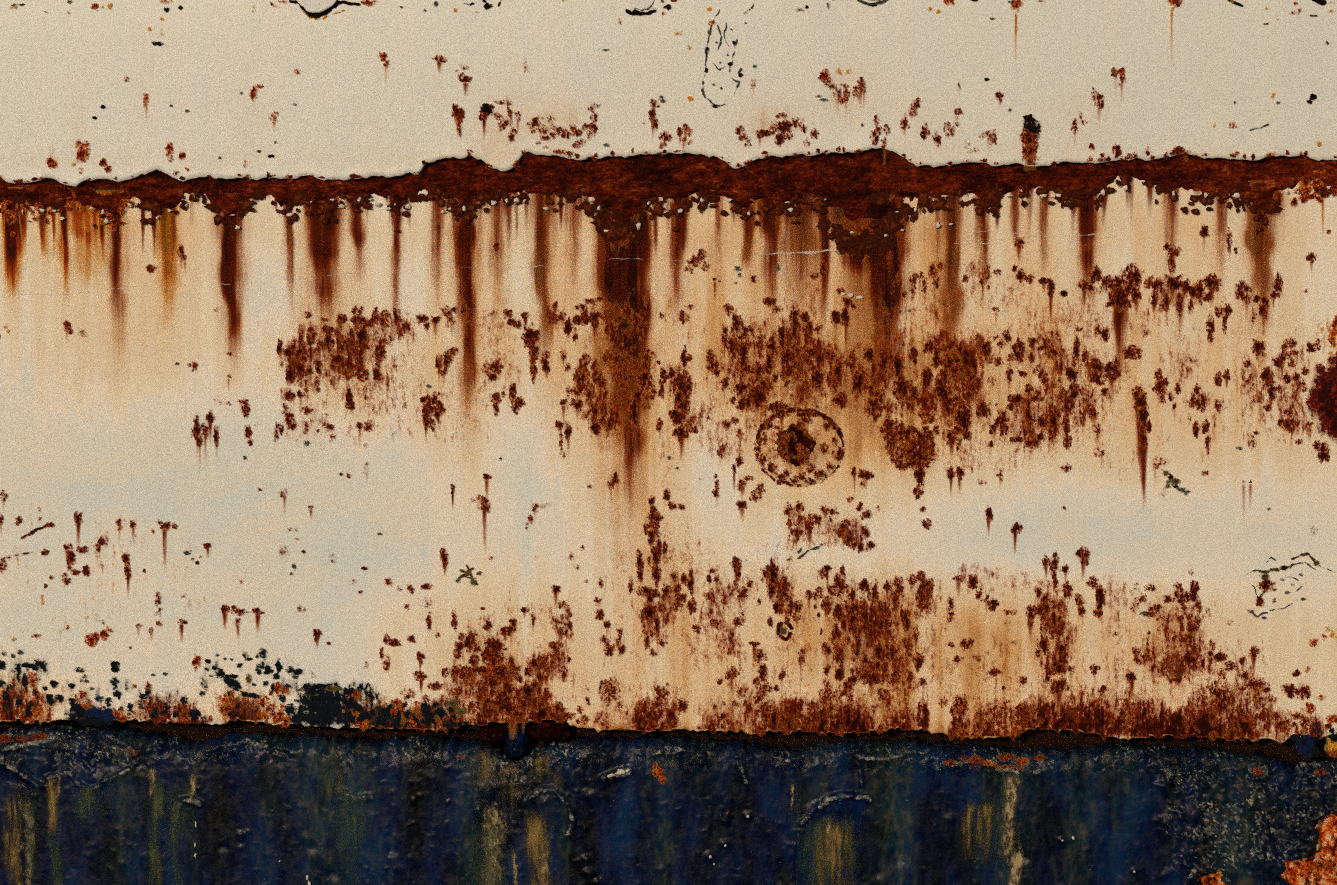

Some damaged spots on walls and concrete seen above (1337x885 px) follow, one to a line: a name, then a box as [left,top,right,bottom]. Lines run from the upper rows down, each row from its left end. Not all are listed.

peeling [297,0,337,13]
peeling [628,0,654,11]
corrosion [0,55,1337,515]
corrosion [0,490,177,605]
peeling [0,650,201,722]
corrosion [120,681,291,728]
corrosion [221,604,264,635]
peeling [200,648,479,730]
corrosion [342,577,688,734]
corrosion [568,545,626,656]
corrosion [628,489,1337,770]
corrosion [1281,811,1337,885]